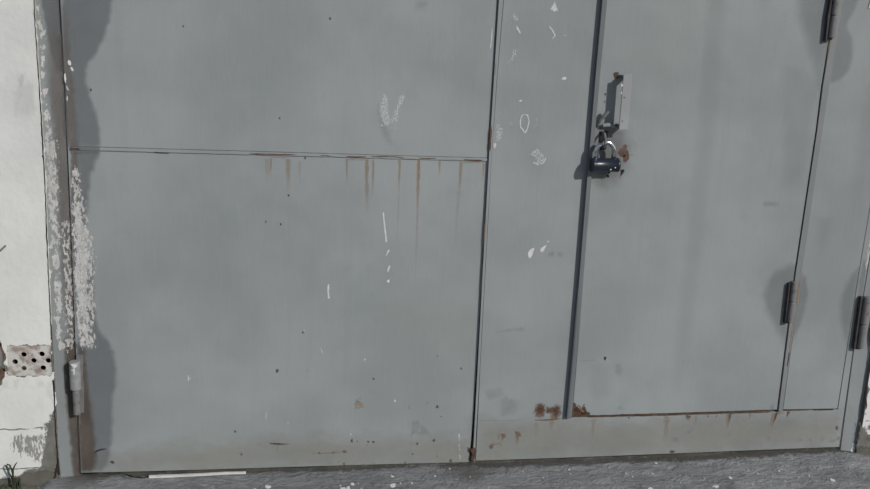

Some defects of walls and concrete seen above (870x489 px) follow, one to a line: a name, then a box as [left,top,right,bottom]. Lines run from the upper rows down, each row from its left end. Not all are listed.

corrosion [618,144,635,163]
peeling [36,5,97,353]
corrosion [535,404,560,421]
corrosion [573,403,833,420]